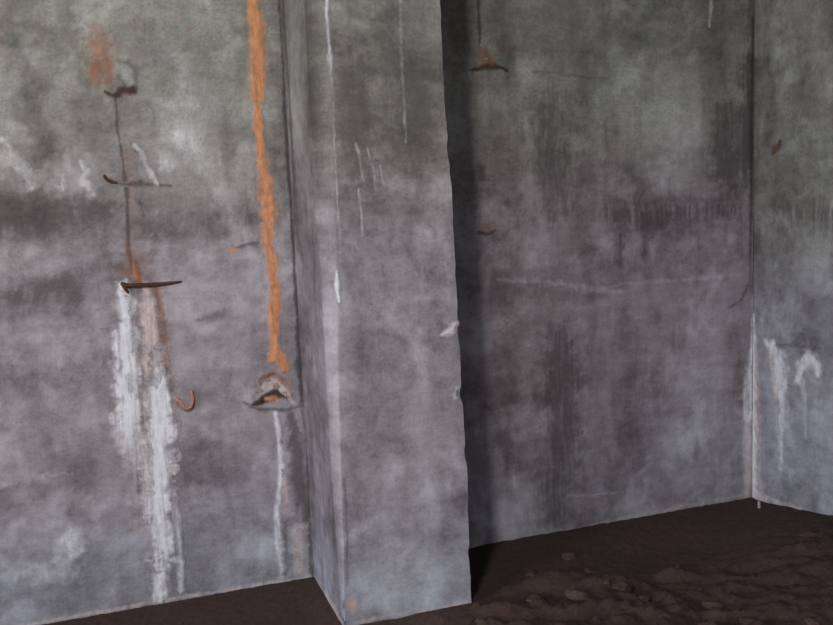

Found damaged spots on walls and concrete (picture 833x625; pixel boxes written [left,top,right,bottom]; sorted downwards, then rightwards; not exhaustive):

rust [103,174,174,189]
rust [227,0,292,373]
damp [322,0,343,304]
damp [398,0,408,143]
damp [767,185,833,260]
efflorescence [99,277,186,606]
rust [109,230,185,432]
spalling [241,367,303,414]
damp [737,312,824,502]